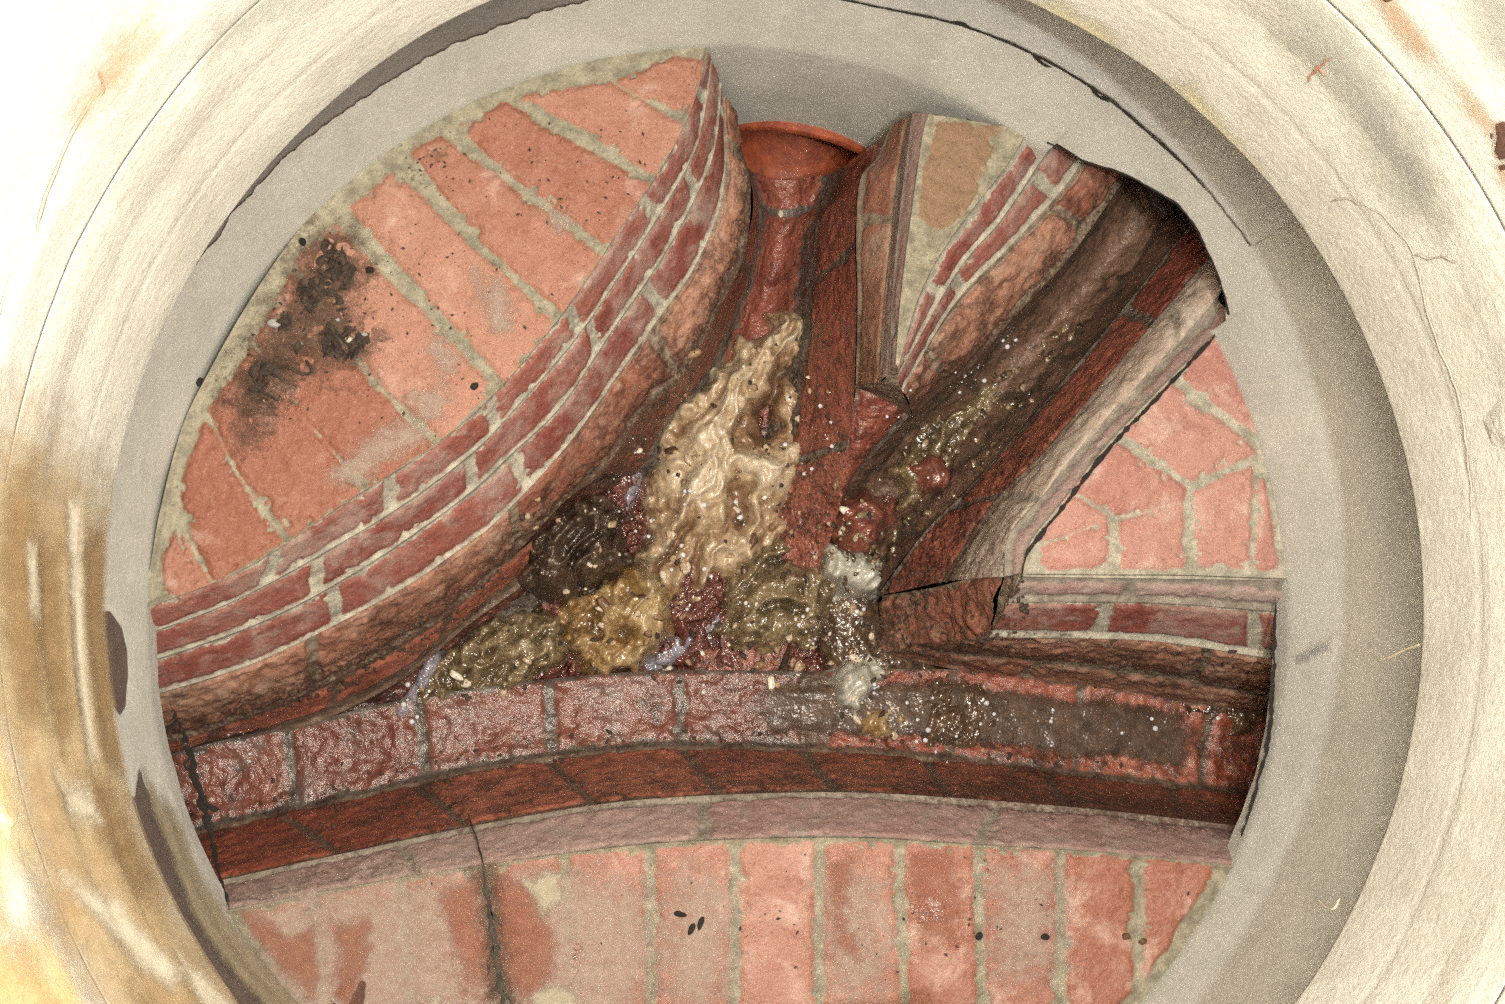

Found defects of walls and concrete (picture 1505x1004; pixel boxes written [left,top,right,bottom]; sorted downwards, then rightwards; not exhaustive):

damp [0,438,300,1004]
crack [467,812,521,1004]